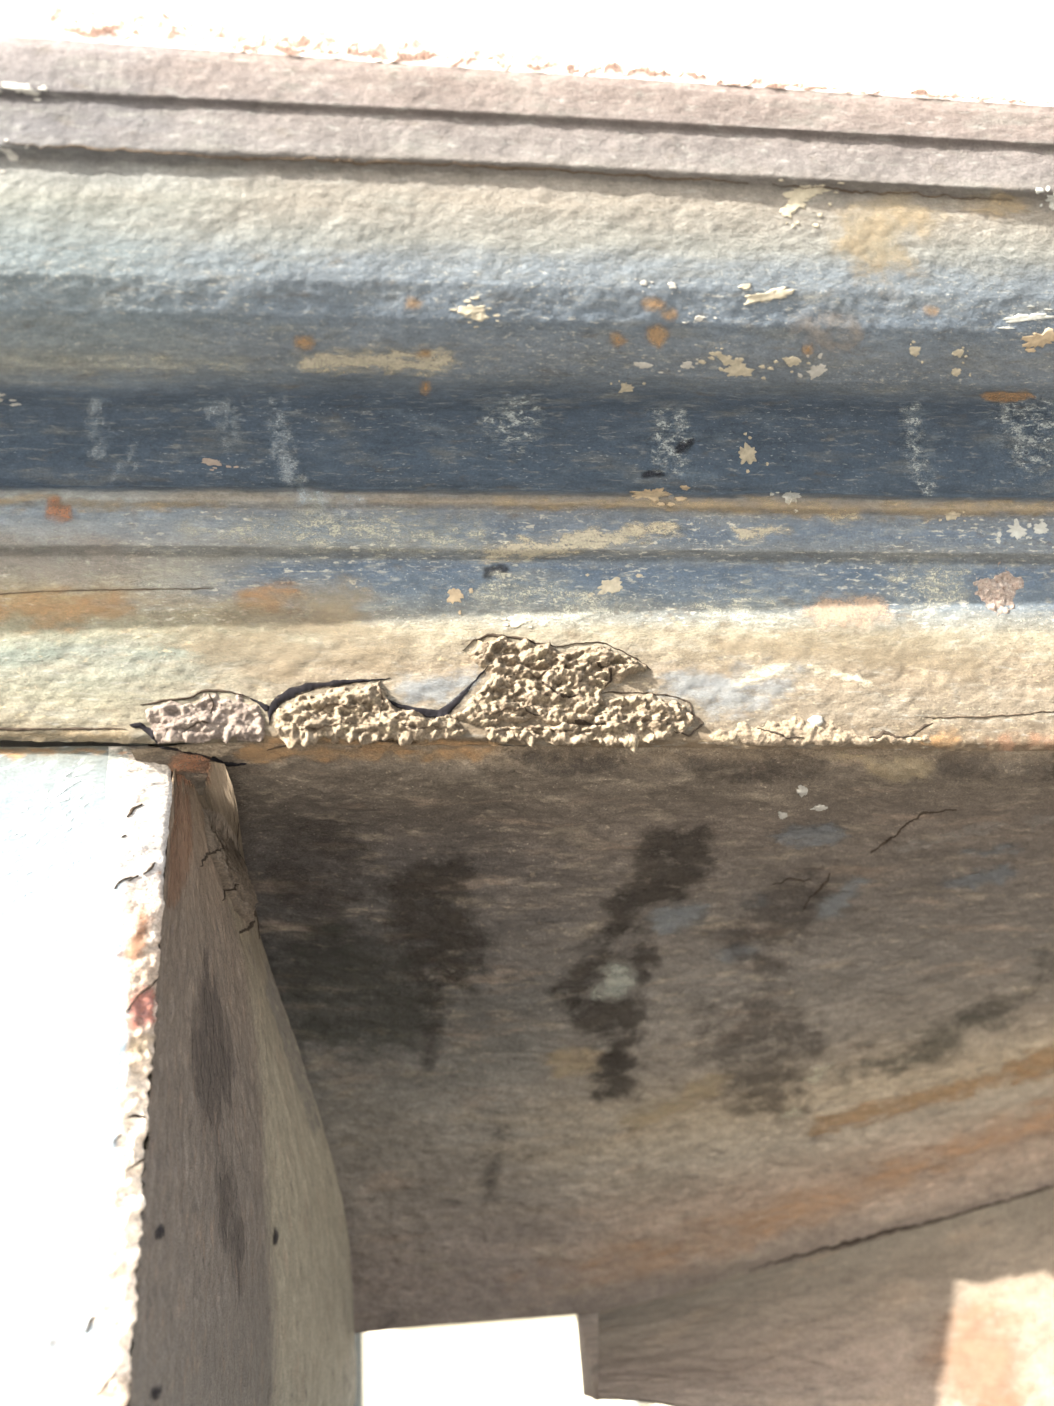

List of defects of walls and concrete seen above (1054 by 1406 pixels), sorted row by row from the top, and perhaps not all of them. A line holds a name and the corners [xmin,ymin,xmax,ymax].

peeling [777,179,844,228]
peeling [450,296,501,328]
peeling [738,284,794,305]
peeling [1000,306,1054,352]
peeling [610,348,828,393]
peeling [738,432,769,473]
crack [871,809,957,854]
crack [773,873,831,910]
spalling [71,470,695,1406]
water stain [385,861,486,1052]
water stain [552,827,714,1101]
crack [749,1186,1054,1271]